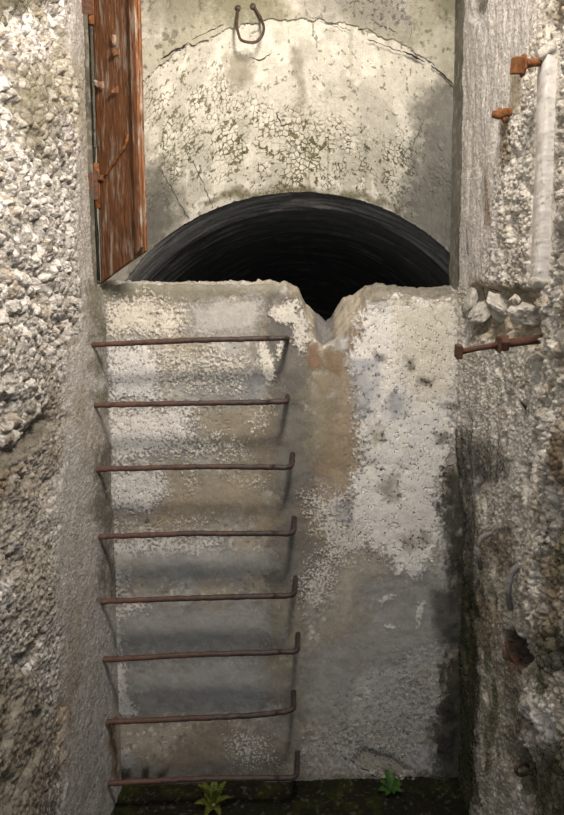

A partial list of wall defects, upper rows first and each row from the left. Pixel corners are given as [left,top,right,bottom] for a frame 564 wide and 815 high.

crack [162,25,221,59]
spalling [554,201,564,232]
water stain [89,283,389,787]
peeling [221,721,285,773]
peeling [104,275,564,718]
spalling [300,599,446,780]
water stain [419,432,498,815]